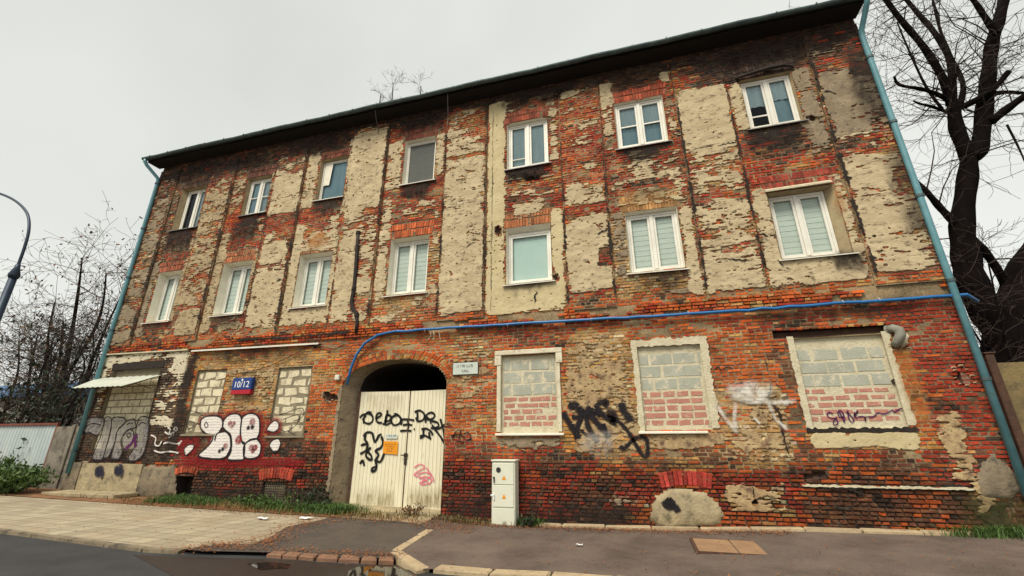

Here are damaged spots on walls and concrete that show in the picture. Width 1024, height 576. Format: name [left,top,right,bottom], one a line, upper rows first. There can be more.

water stain [848,51,887,116]
flaking render [96,43,937,428]
flaking render [724,483,788,512]
flaking render [935,411,996,514]